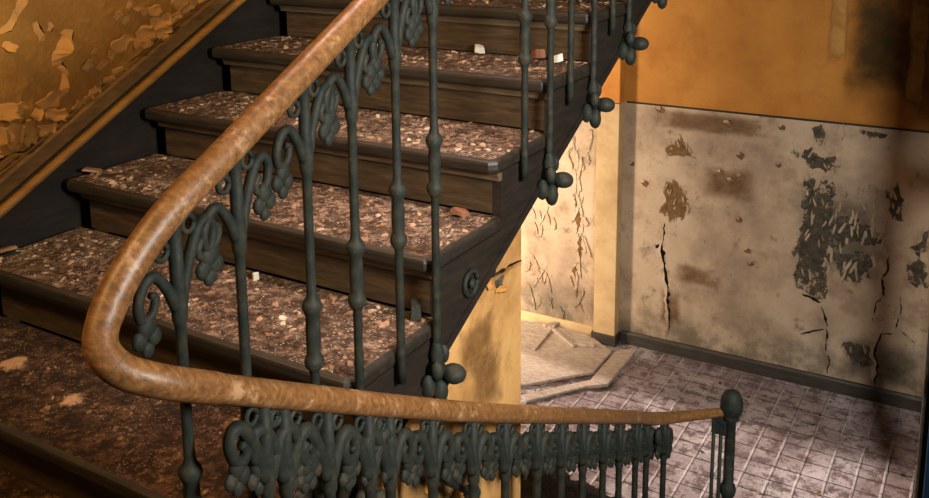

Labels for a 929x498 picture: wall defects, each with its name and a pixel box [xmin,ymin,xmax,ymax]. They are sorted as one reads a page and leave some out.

peeling [0,0,206,159]
water stain [861,1,929,105]
flaking render [665,134,696,159]
flaking render [660,179,689,222]
flaking render [792,124,929,300]
crack [655,223,671,337]
crack [801,294,830,373]
flaking render [840,341,874,367]
crack [869,249,920,387]